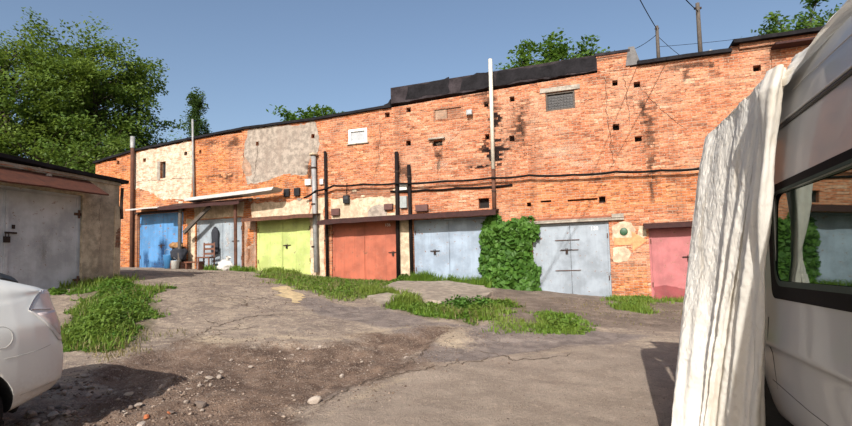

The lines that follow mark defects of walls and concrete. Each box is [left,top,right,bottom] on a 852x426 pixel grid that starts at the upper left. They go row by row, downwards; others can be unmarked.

damp [471,97,510,169]
crack [583,73,683,162]
damp [640,103,654,142]
spalling [247,171,308,201]